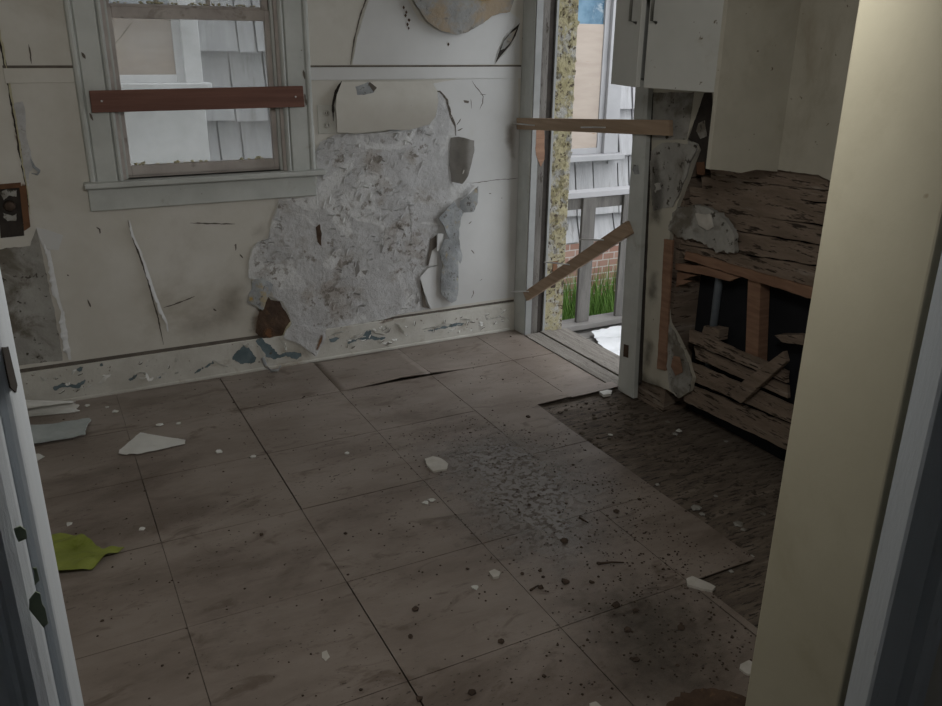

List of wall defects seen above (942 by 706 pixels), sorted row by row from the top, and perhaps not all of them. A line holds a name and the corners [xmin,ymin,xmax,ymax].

crack [0,30,31,214]
flaking render [0,227,111,394]
flaking render [195,91,509,373]